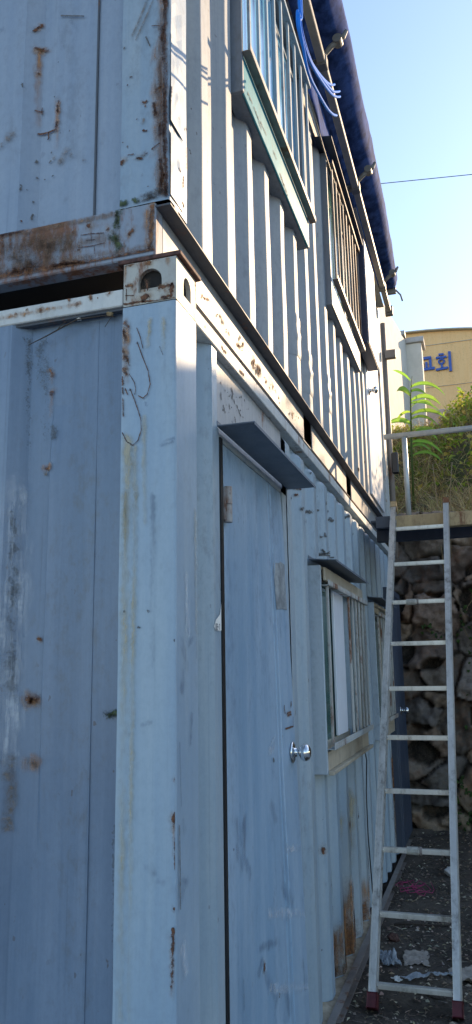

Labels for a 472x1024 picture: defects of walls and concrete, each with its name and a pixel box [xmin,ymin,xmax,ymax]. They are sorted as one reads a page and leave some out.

corrosion [151,0,169,196]
corrosion [0,204,175,305]
corrosion [334,885,370,974]